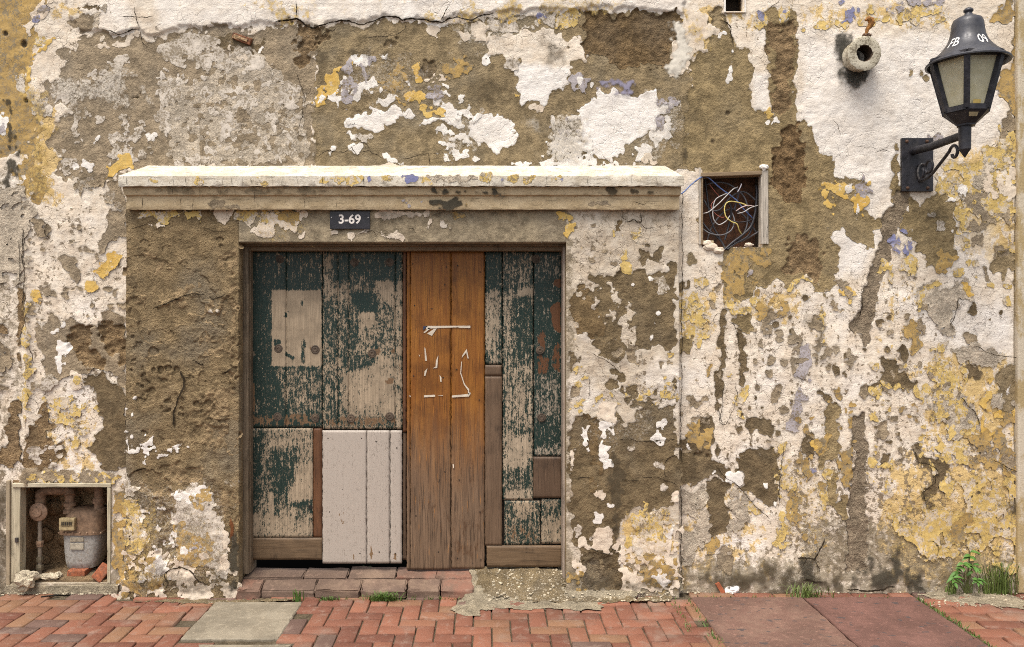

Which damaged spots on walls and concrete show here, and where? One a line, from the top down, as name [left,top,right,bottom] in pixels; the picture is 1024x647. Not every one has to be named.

crack [107,7,153,46]
peeling [0,0,1016,455]
peeling [0,282,242,600]
peeling [566,313,1016,597]
leakage [698,546,927,595]